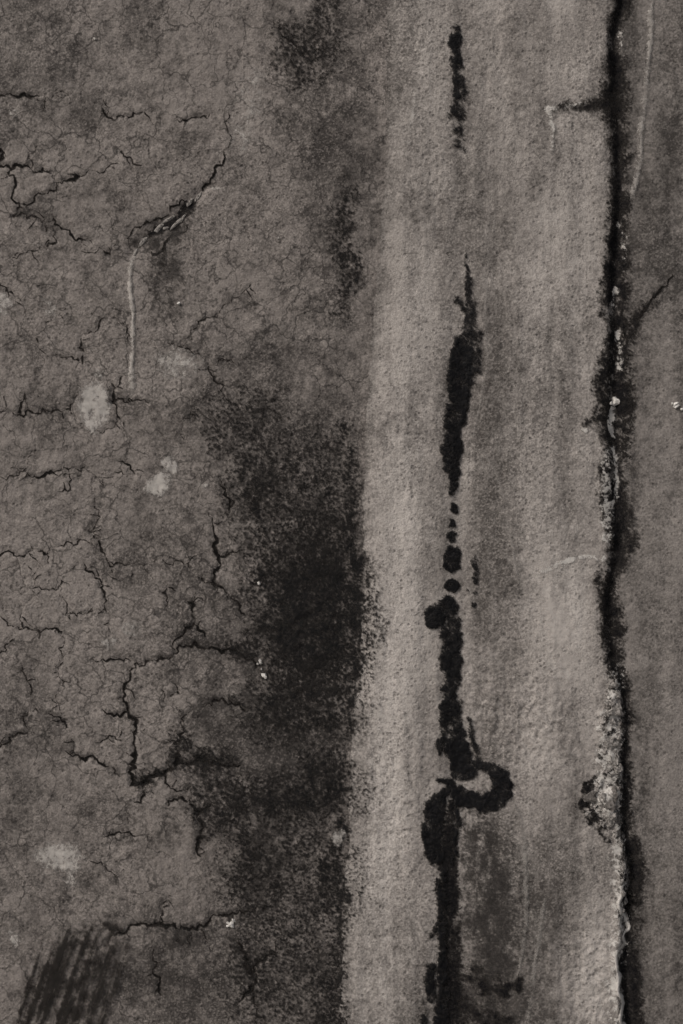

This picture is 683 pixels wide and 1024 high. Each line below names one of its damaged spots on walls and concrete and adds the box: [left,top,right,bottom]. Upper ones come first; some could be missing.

crack [0,0,389,1024]
leakage [133,380,390,1024]
leakage [448,463,461,496]
leakage [432,805,536,1024]
leakage [539,0,664,1024]